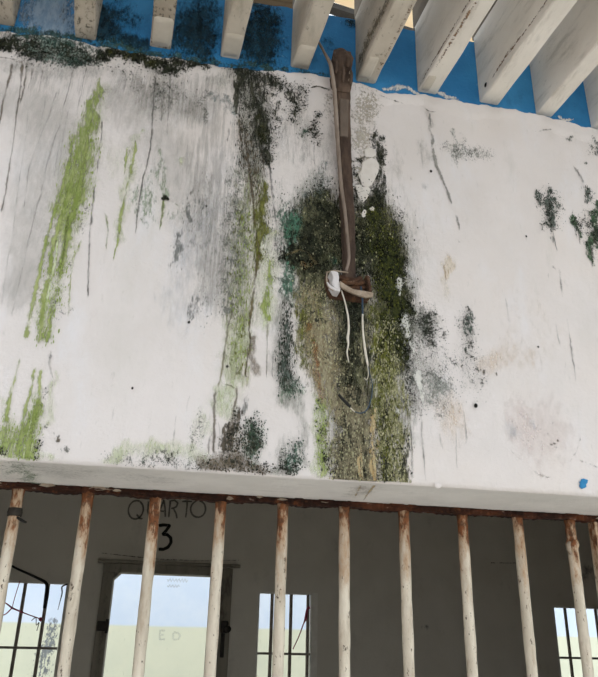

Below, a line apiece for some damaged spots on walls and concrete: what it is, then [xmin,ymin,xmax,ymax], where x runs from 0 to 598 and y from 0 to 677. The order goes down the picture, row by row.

water stain [0,0,497,483]
water stain [535,183,598,266]